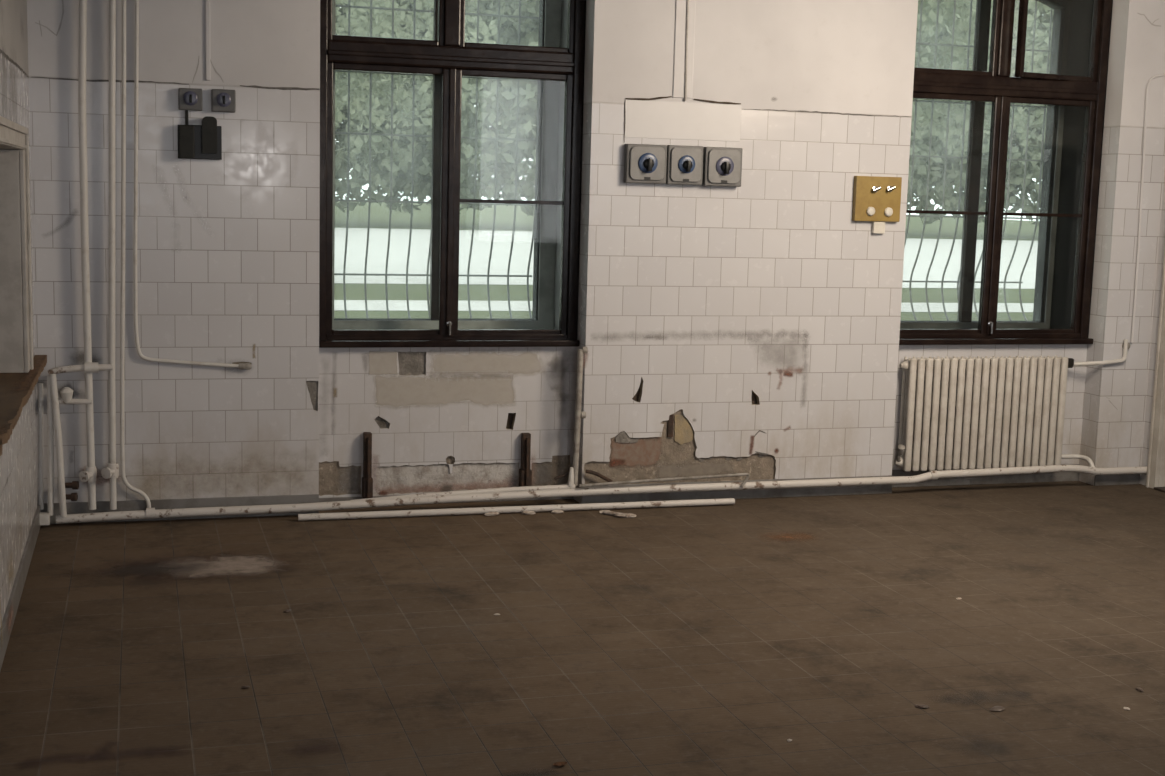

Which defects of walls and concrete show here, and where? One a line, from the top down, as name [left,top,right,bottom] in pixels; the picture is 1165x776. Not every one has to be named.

peeling [398,351,426,376]
spalling [374,416,390,429]
spalling [560,409,776,484]